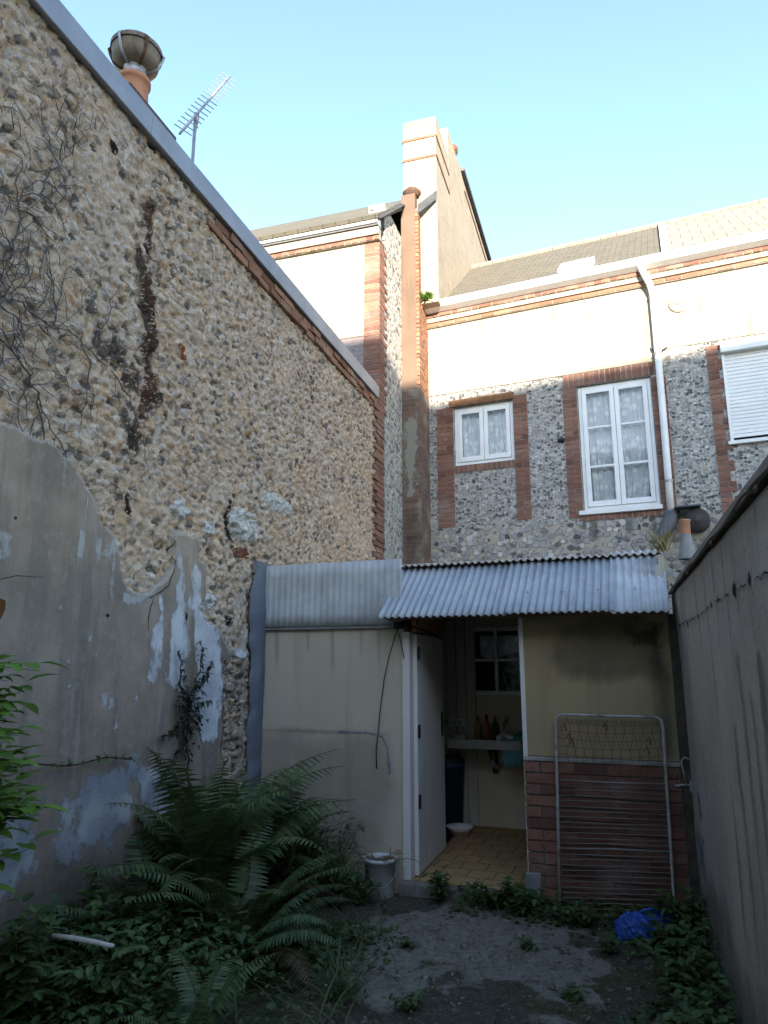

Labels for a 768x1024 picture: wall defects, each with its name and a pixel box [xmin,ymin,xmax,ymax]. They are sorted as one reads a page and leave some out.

peeling [147,550,247,779]
peeling [0,804,38,903]
peeling [53,753,180,871]